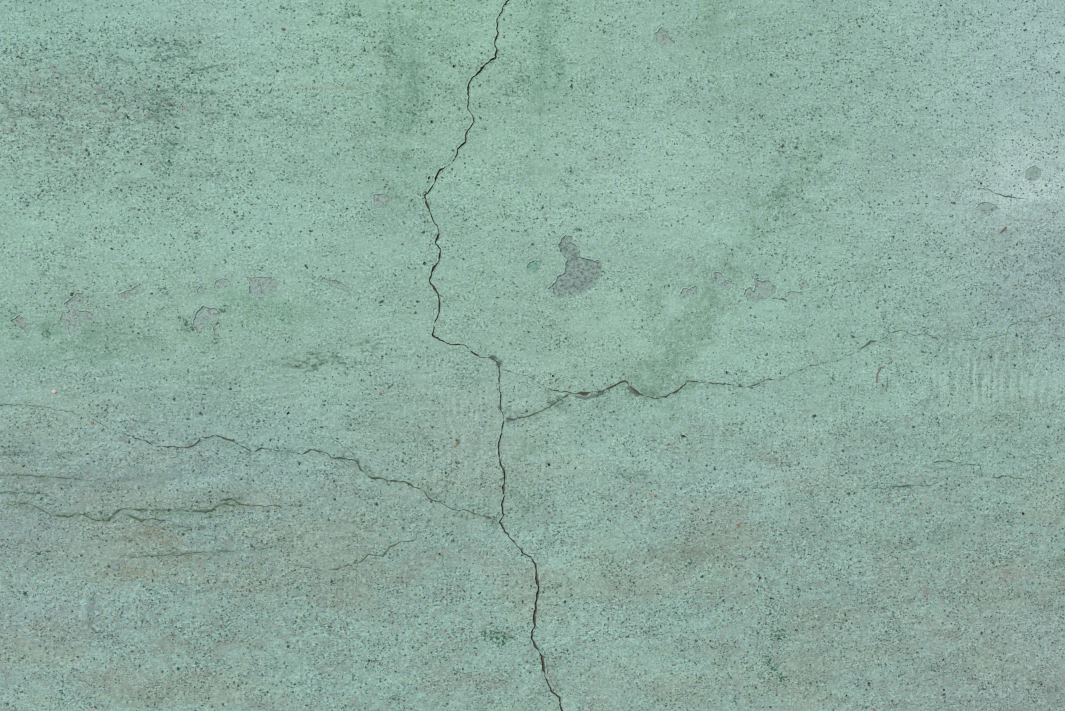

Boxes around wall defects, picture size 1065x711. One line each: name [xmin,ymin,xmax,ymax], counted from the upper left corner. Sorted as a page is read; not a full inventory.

peeling [546,234,604,300]
crack [123,0,777,711]
crack [0,474,304,522]